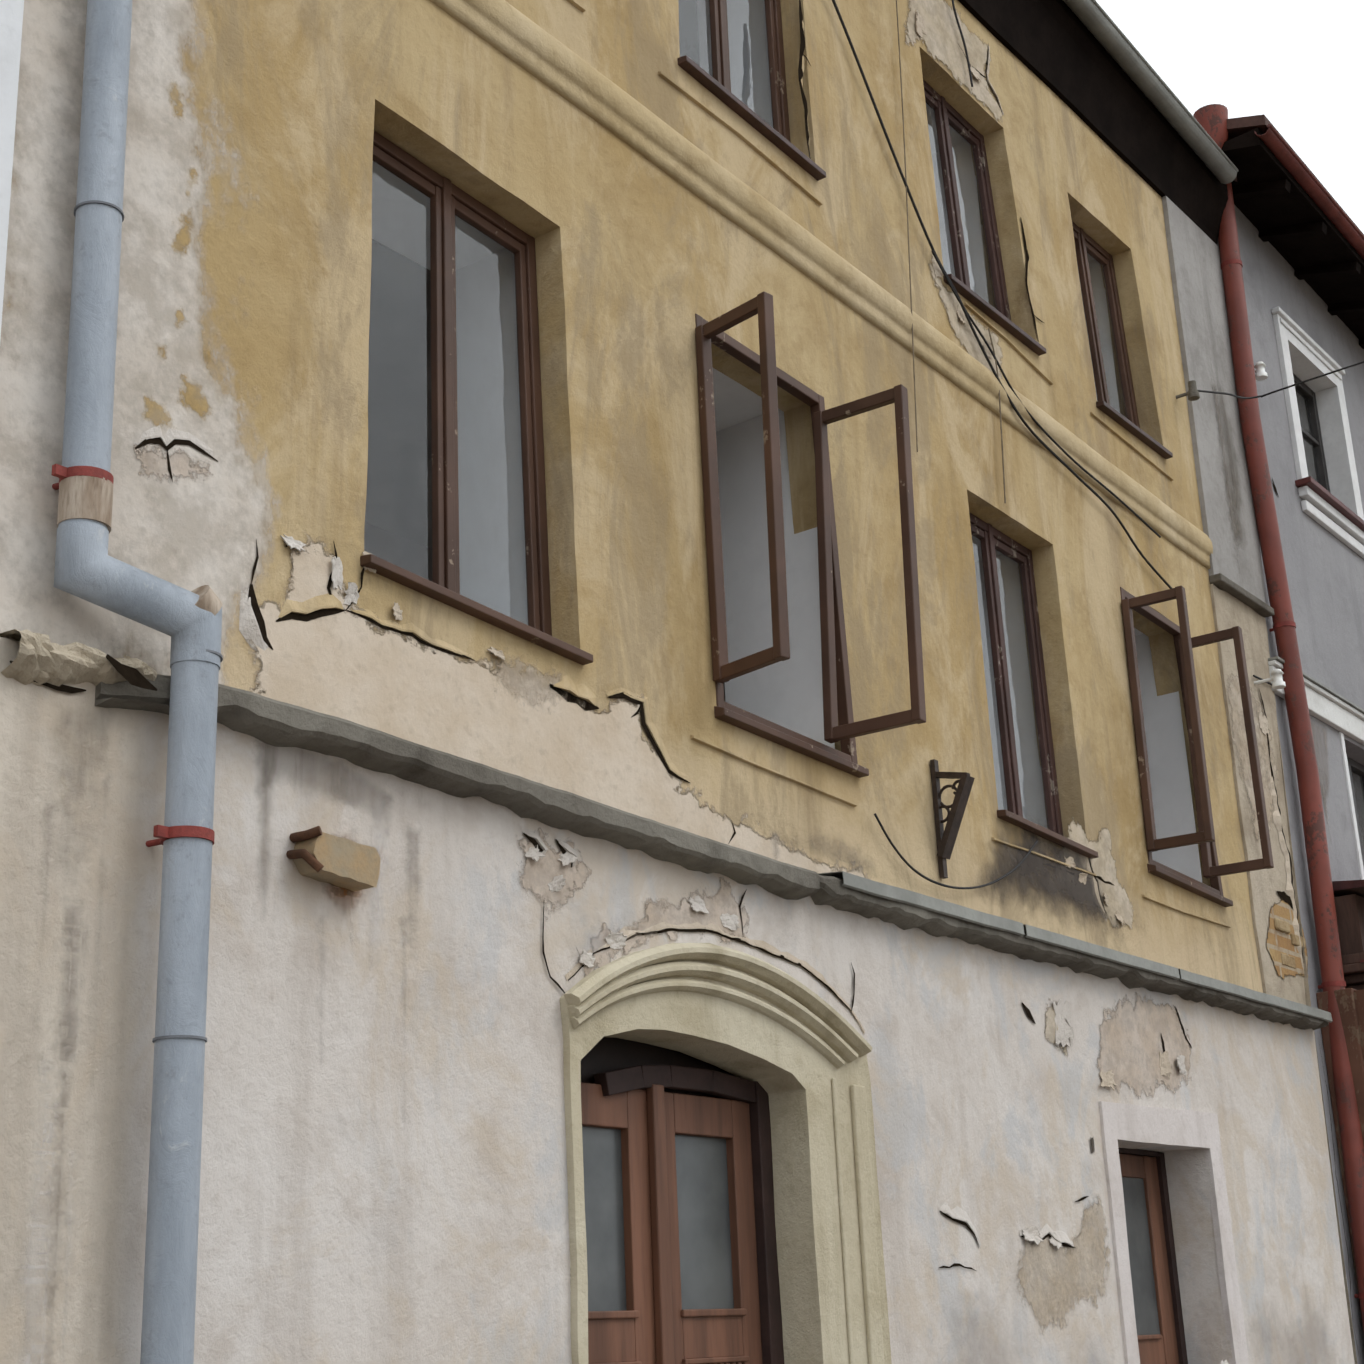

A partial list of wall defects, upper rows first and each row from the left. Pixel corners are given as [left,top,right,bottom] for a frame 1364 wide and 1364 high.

flaking render [904,0,1002,122]
peeling [0,0,171,694]
crack [134,423,218,482]
peeling [108,0,868,879]
flaking render [518,828,592,920]
flaking render [1064,821,1134,928]
flaking render [579,878,749,977]
flaking render [1266,900,1308,980]
flaking render [1097,993,1191,1097]
crack [939,1202,981,1271]
crack [1019,1223,1076,1248]
flaking render [1018,1199,1110,1328]